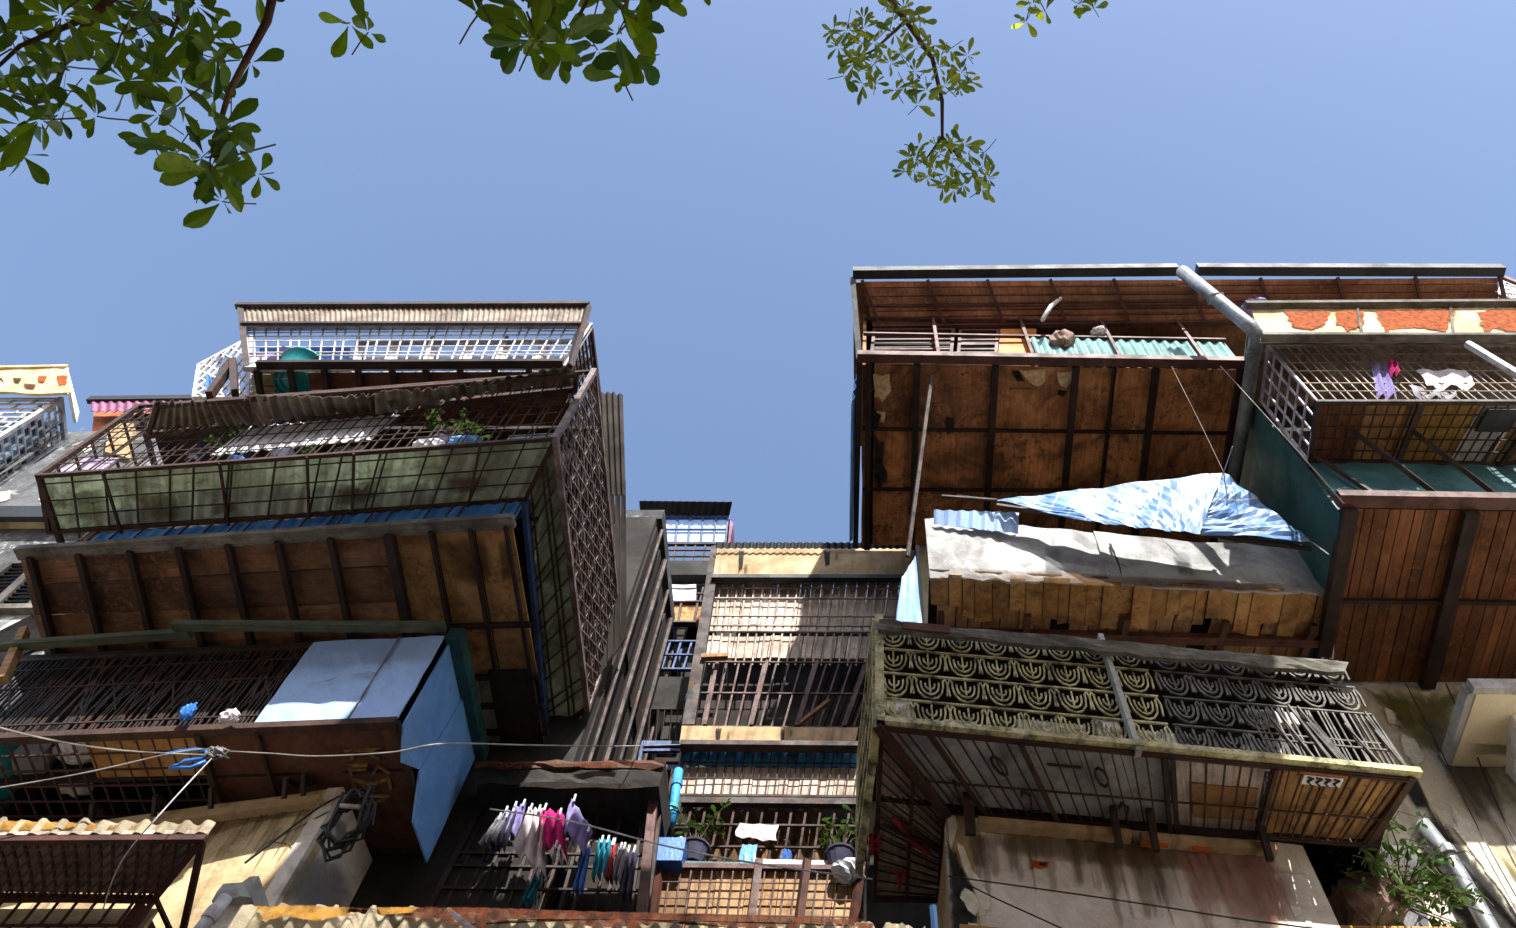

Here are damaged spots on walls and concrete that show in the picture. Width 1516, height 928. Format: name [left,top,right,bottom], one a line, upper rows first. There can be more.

damp [1018,835,1283,916]